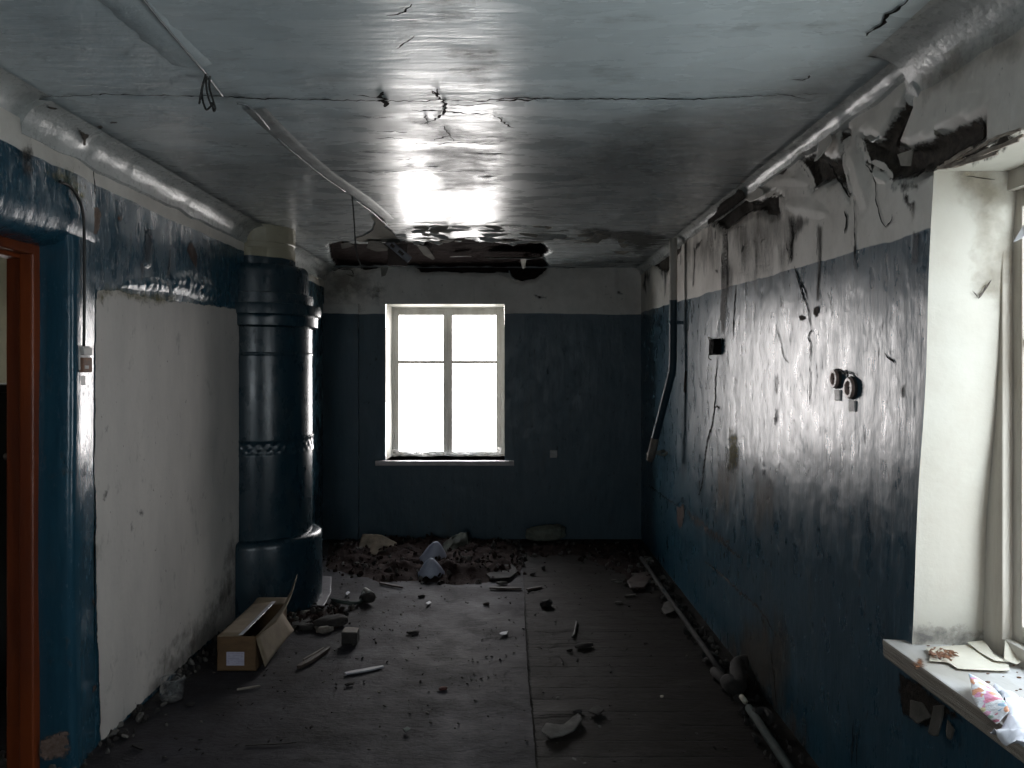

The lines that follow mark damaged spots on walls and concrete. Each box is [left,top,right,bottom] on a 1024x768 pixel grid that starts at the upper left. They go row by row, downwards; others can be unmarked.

crack [866,0,908,36]
crack [43,75,812,173]
flaking render [804,131,852,196]
flaking render [863,102,1024,180]
flaking render [329,217,665,281]
flaking render [700,187,781,229]
damp [789,217,803,259]
crack [776,164,893,405]
crack [698,357,720,495]
flaking render [898,673,957,739]
flaking render [39,731,70,761]